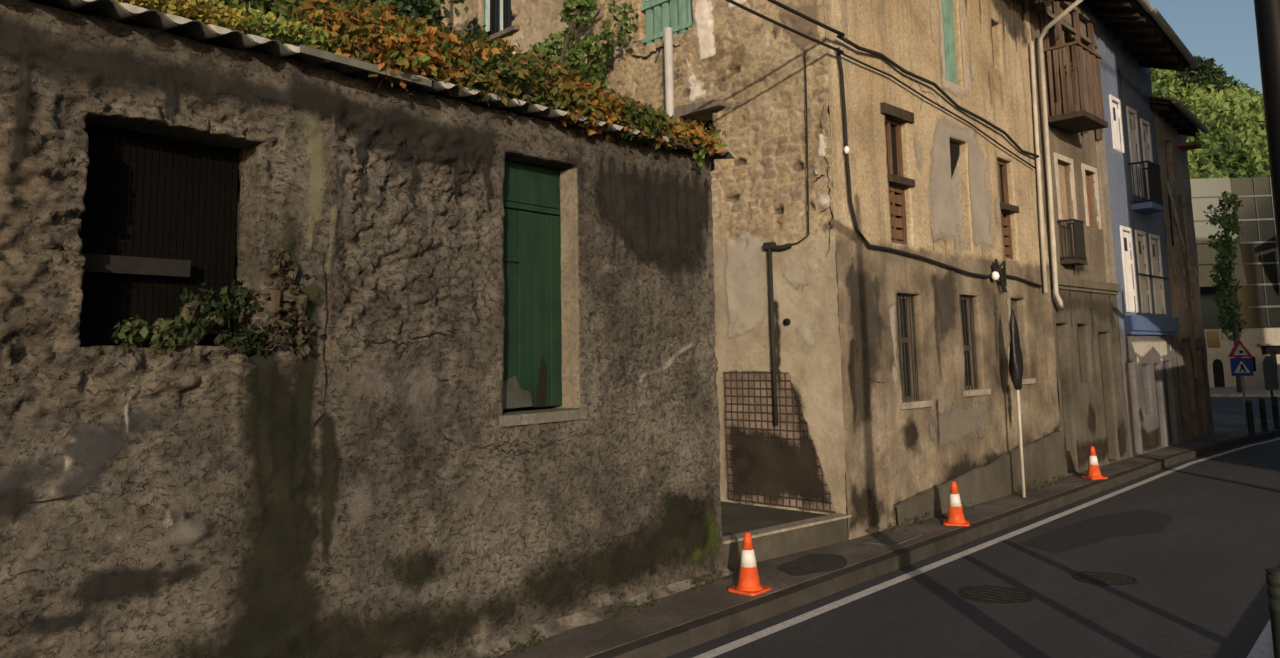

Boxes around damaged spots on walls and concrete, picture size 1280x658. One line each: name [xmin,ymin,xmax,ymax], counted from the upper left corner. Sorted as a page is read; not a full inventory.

peeling [687,0,750,101]
leakage [595,156,709,274]
leakage [846,264,884,422]
leakage [932,270,957,376]
leakage [0,396,156,518]
leakage [177,330,713,658]
leakage [728,300,828,504]
leakage [850,486,899,530]
leakage [905,421,918,449]
leakage [941,453,1003,485]
leakage [29,564,200,635]